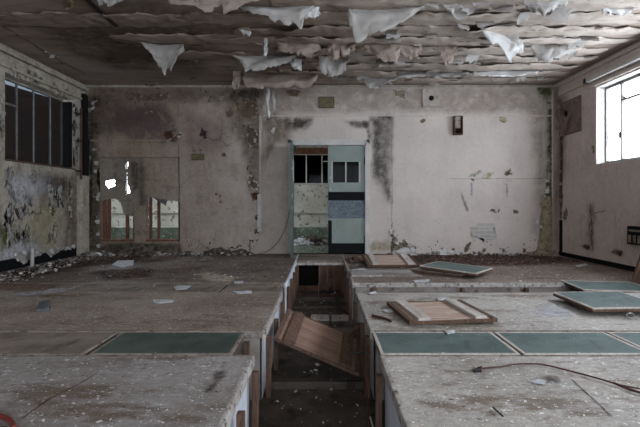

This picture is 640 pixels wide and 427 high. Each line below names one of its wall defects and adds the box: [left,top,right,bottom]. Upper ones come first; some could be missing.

peeling [167,0,320,30]
peeling [141,42,185,75]
peeling [224,0,599,158]
peeling [1,147,128,291]
water stain [7,90,181,280]
peeling [246,172,259,201]
water stain [351,117,391,184]
spalling [384,229,471,264]
flaking render [464,222,497,253]
water stain [538,87,564,199]
peeling [544,132,568,221]